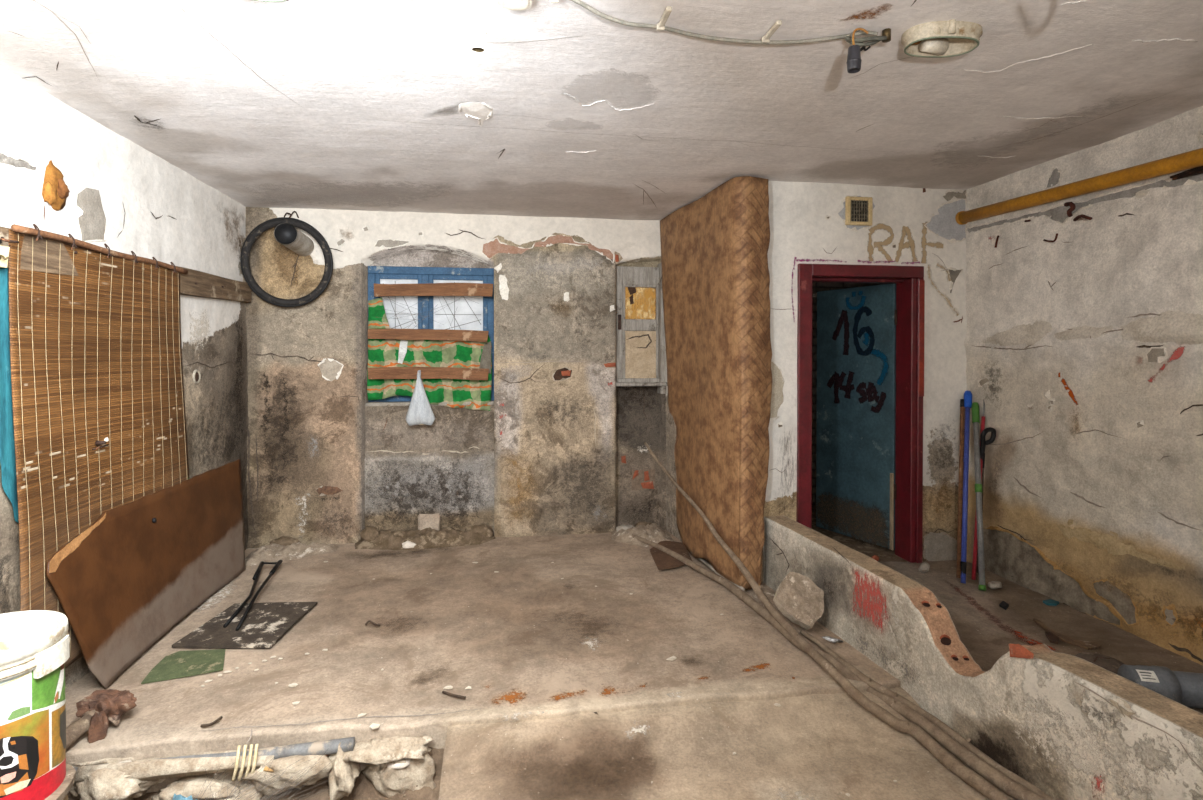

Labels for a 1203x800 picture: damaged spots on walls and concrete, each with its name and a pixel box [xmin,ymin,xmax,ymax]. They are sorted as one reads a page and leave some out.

crack [964,44,1093,73]
spalling [0,153,36,170]
peeling [1046,168,1061,189]
peeling [924,173,1203,243]
spalling [482,235,623,300]
water stain [262,371,318,484]
water stain [376,456,479,525]
water stain [296,494,346,533]
spalling [940,634,969,661]
corrosion [487,685,527,705]
corrosion [552,684,647,701]